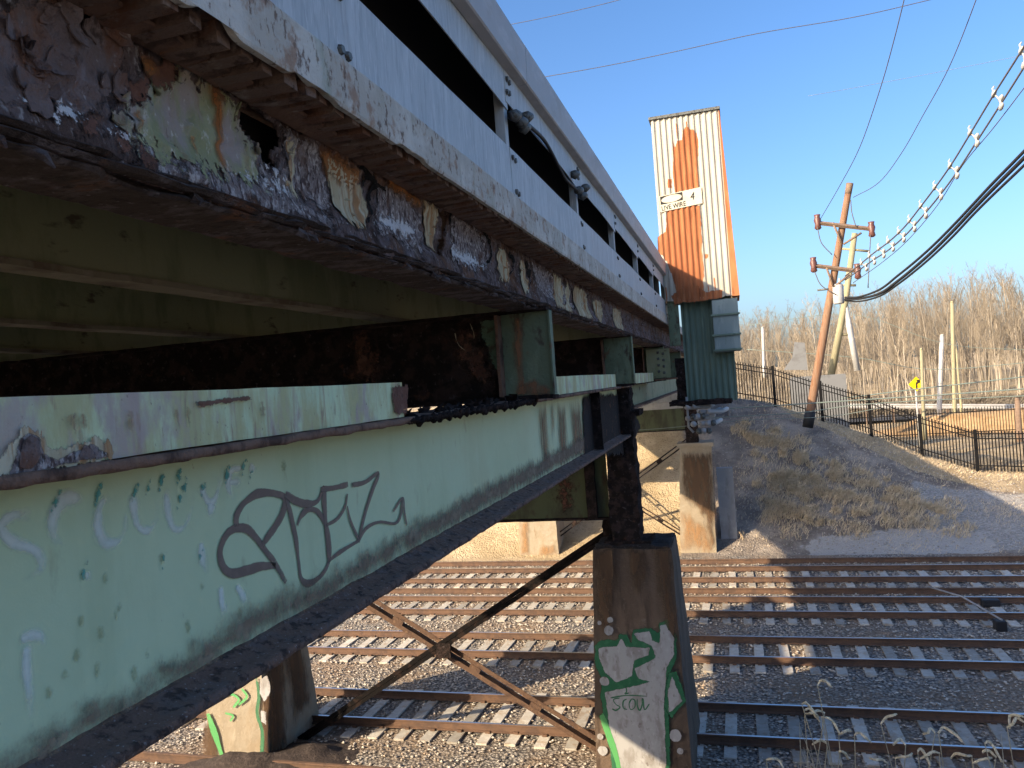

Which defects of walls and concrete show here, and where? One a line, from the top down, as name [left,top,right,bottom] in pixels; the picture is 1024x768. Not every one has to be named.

peeling [111,65,272,195]
corrosion [212,89,226,165]
peeling [285,136,298,199]
peeling [328,157,368,230]
peeling [423,199,438,253]
peeling [496,247,529,294]
peeling [553,273,624,330]
corrosion [667,122,699,193]
corrosion [658,205,722,305]
corrosion [163,319,624,680]